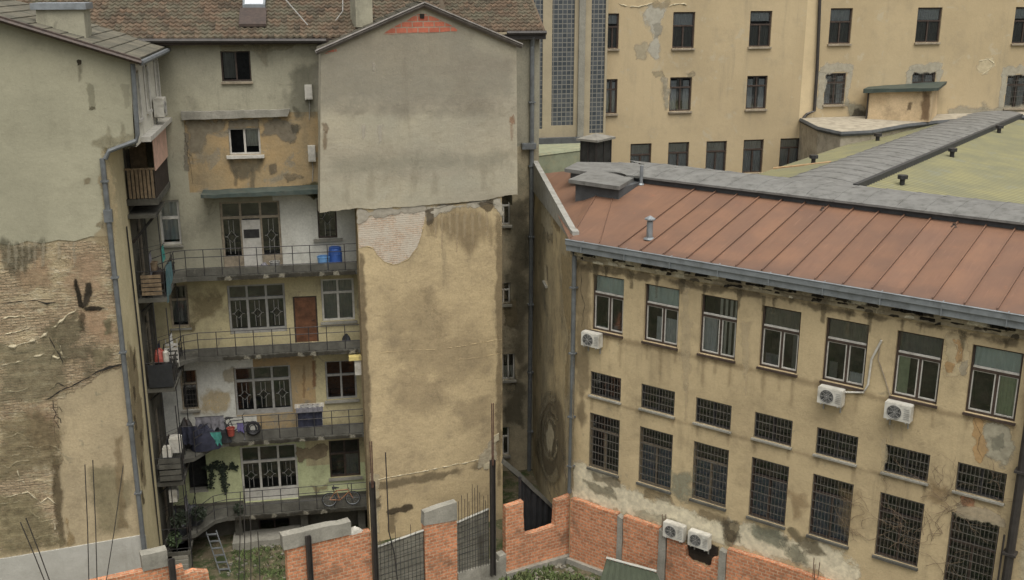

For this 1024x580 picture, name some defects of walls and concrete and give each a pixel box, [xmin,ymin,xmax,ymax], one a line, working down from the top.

flaking render [634,0,687,108]
flaking render [184,118,300,171]
flaking render [269,164,303,183]
flaking render [356,198,504,265]
flaking render [0,241,146,580]
crack [45,337,122,448]
water stain [543,417,565,466]
flaking render [561,253,1019,580]